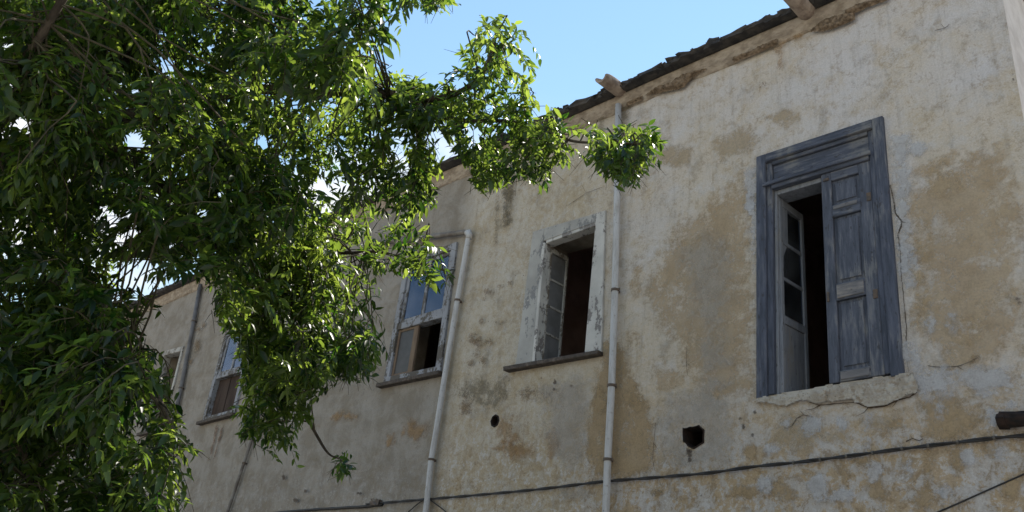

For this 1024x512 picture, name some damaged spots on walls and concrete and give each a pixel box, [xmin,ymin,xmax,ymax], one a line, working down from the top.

crack [786,185,978,431]
peeling [803,414,886,501]